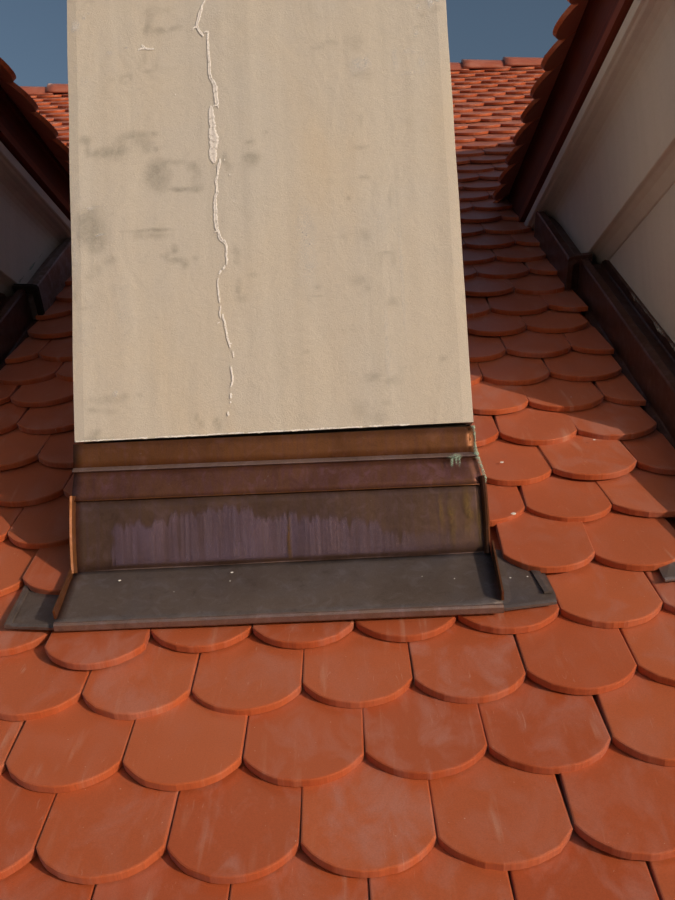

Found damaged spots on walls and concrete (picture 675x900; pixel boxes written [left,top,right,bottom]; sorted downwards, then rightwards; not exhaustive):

crack [192,0,234,416]